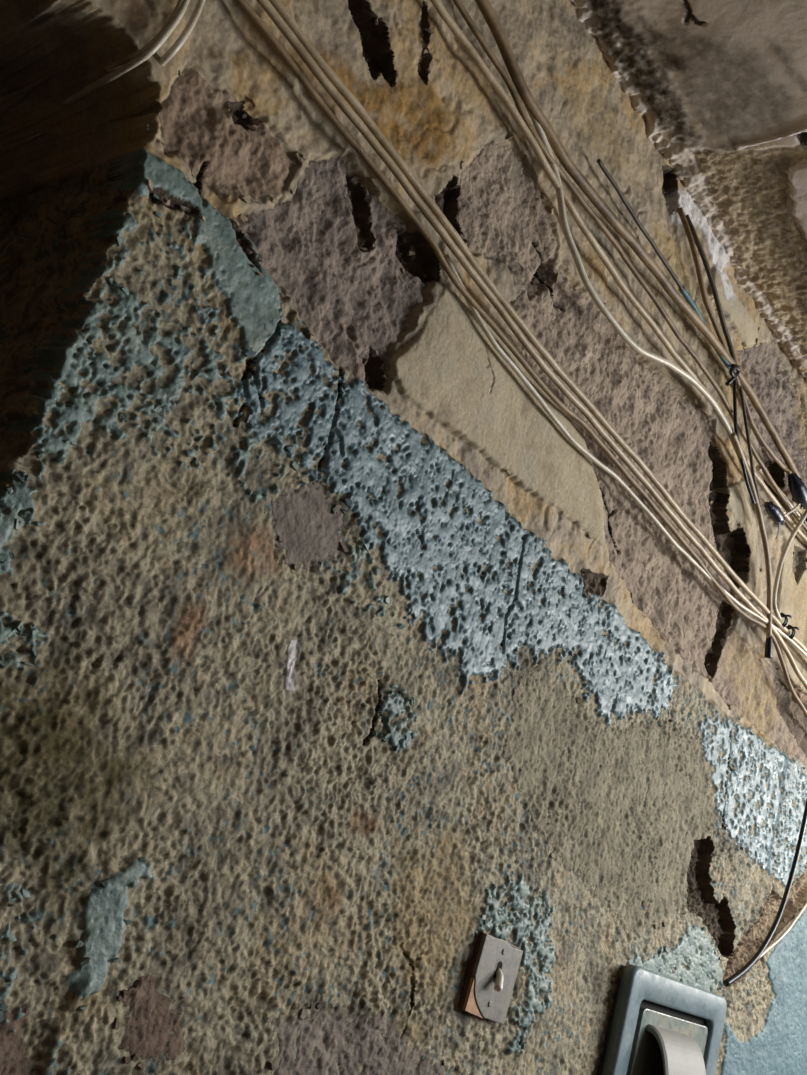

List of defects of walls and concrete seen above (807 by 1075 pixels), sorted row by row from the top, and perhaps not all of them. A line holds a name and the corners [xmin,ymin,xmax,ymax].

flaking render [348,0,397,87]
flaking render [417,1,433,86]
flaking render [131,69,295,204]
crack [531,242,564,312]
crack [232,348,266,427]
crack [334,369,344,415]
peeling [0,143,807,993]
crack [362,680,383,746]
peeling [471,871,555,1056]
peeling [720,823,807,1075]
flaking render [113,975,185,1070]
flaking render [267,999,445,1075]